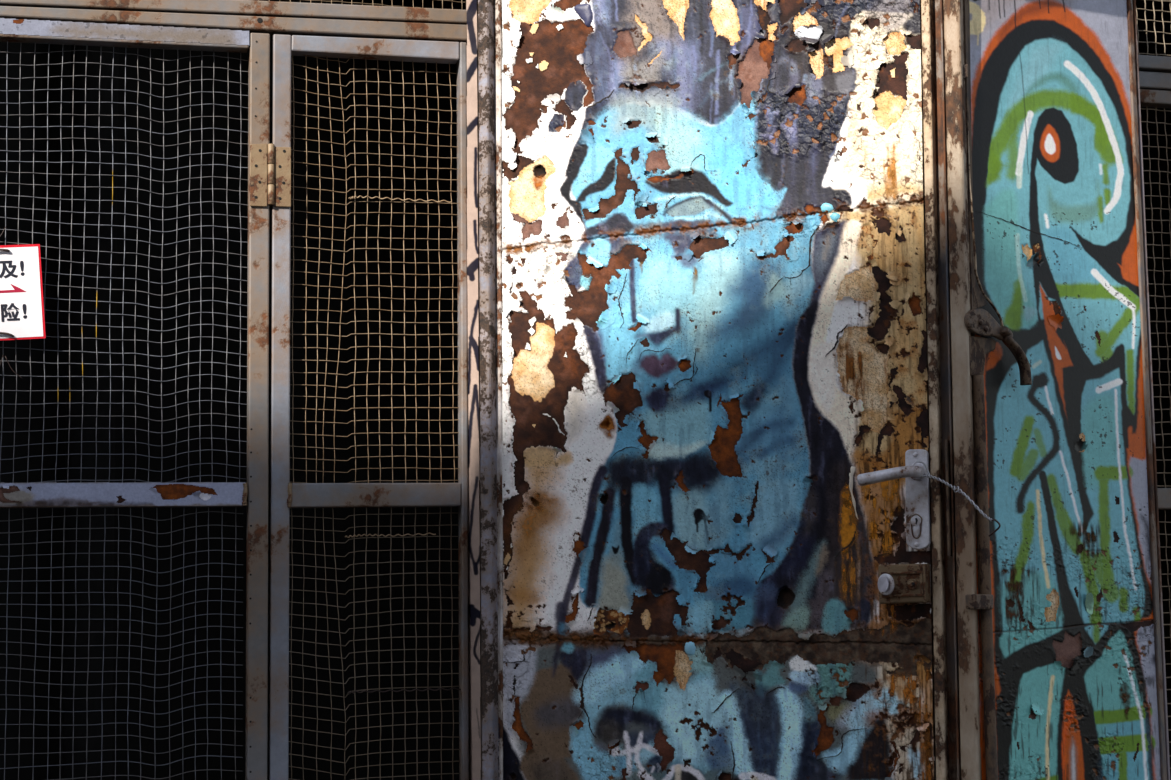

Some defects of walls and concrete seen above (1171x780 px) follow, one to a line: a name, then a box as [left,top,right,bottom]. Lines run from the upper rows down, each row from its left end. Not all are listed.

peeling [504,0,550,24]
peeling [754,0,854,80]
peeling [879,27,907,55]
peeling [867,91,907,130]
peeling [508,155,556,223]
peeling [511,323,555,402]
peeling [836,265,893,433]
rust [708,392,744,478]
rust [0,483,136,507]
rust [149,484,217,502]
rust [503,481,777,693]
peeling [674,651,694,691]